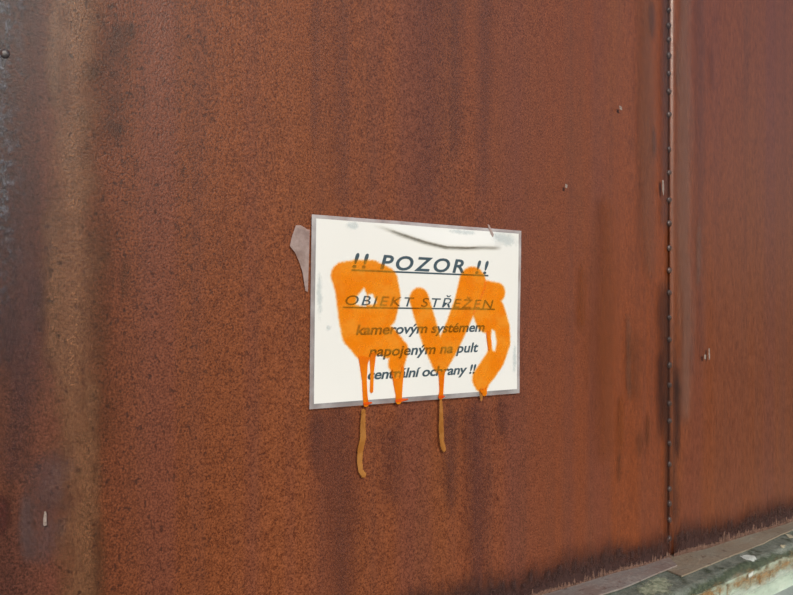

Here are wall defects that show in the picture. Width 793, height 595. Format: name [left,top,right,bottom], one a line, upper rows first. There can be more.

damp [455,505,793,595]